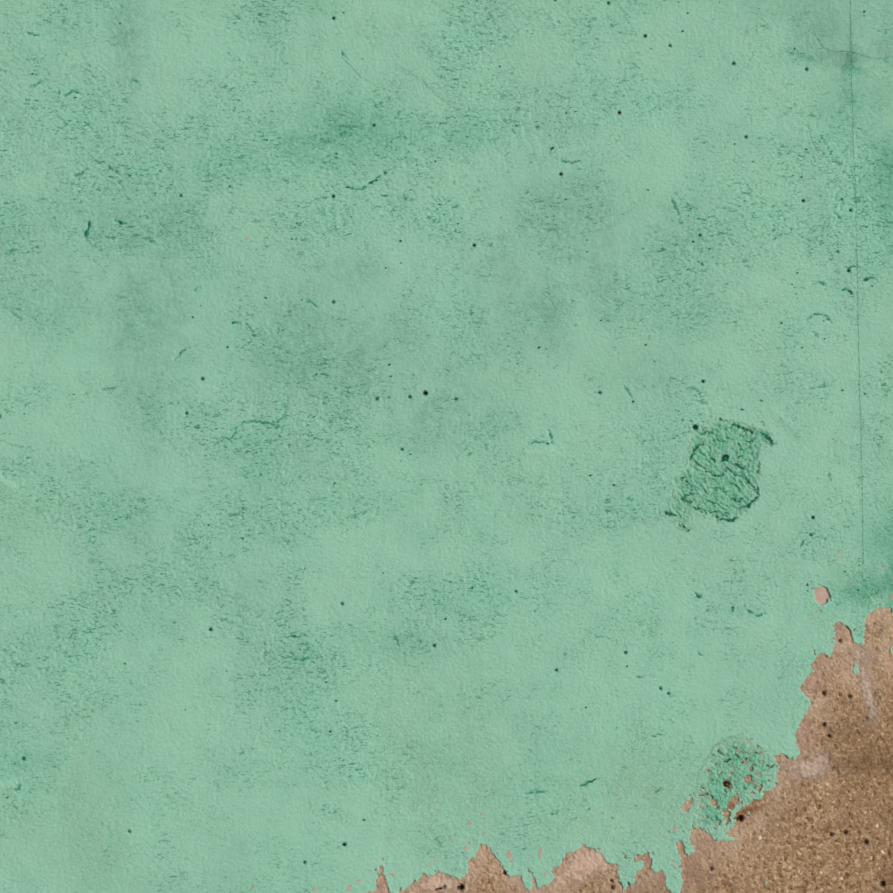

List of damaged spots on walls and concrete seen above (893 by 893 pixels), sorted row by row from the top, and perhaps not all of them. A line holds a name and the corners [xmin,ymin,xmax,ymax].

peeling [366,593,893,893]
peeling [810,586,837,620]